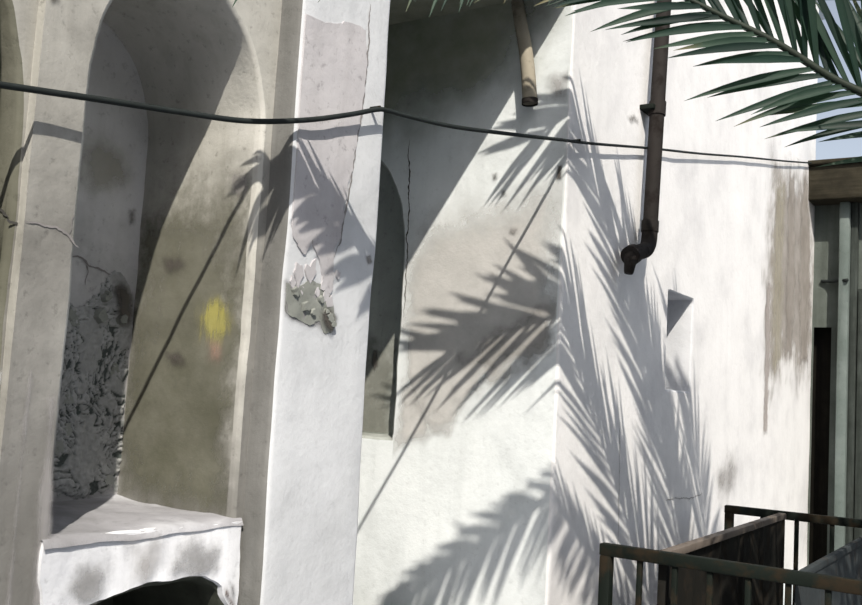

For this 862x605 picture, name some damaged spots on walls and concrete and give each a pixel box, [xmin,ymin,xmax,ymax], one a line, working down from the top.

crack [0,208,110,285]
flaking render [51,270,133,501]
leakage [122,175,247,511]
flaking render [285,14,367,334]
leakage [362,342,396,433]
crack [403,142,411,312]
leakage [396,197,554,444]